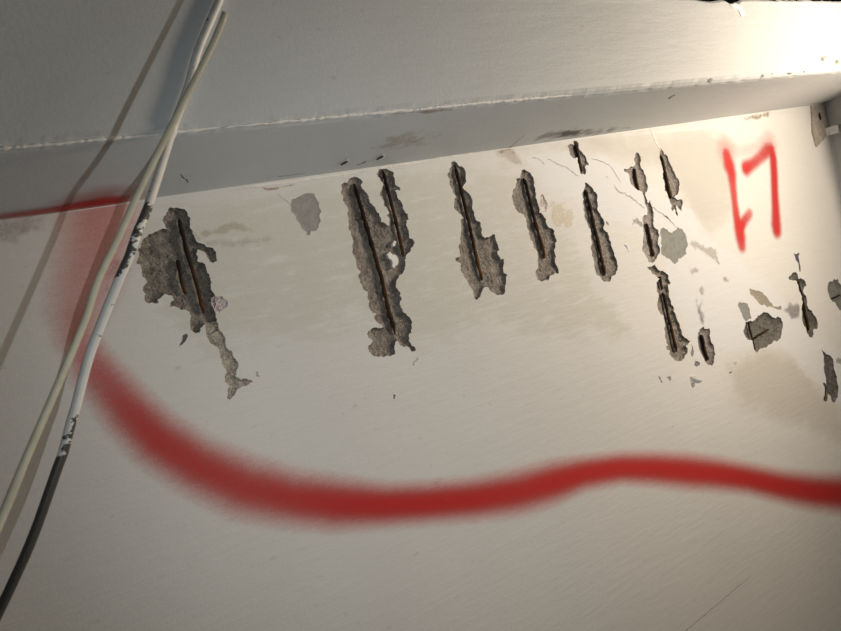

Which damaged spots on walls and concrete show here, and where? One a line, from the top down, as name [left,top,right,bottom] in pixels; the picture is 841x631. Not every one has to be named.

spalling [136,207,260,400]
spalling [341,169,418,365]
spalling [447,161,507,300]
spalling [512,169,559,282]
spalling [568,141,618,282]
spalling [624,148,715,388]
spalling [738,288,783,353]
spalling [788,253,818,338]
spalling [822,351,839,402]